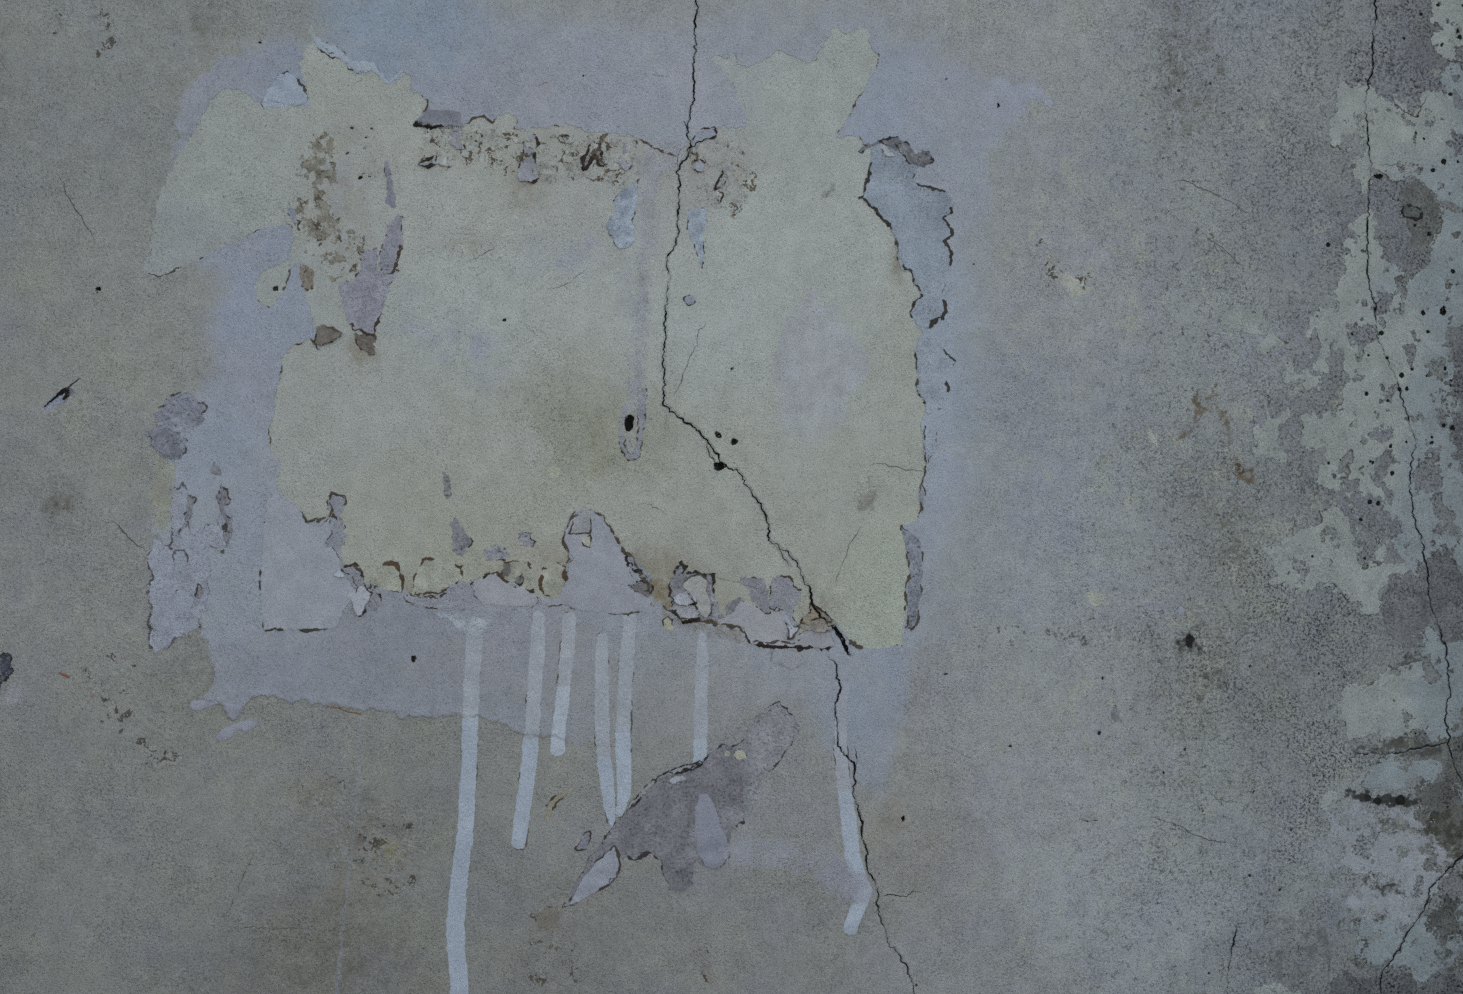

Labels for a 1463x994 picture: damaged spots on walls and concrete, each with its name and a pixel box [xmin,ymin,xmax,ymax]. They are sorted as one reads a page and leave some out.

peeling [82,638,183,770]
peeling [142,27,956,653]
peeling [561,701,800,909]
crack [656,0,922,994]
peeling [1220,0,1463,994]
crack [1343,0,1463,781]
crack [1380,855,1463,994]